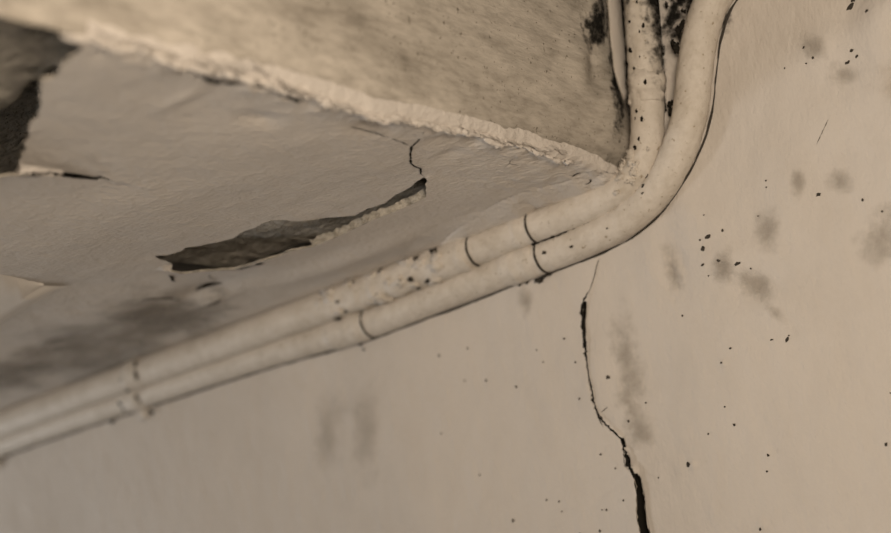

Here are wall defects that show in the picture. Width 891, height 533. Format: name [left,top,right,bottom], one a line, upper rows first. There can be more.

water stain [584,0,693,128]
peeling [0,16,648,306]
crack [393,129,426,175]
peeling [0,274,69,323]
crack [579,260,650,533]